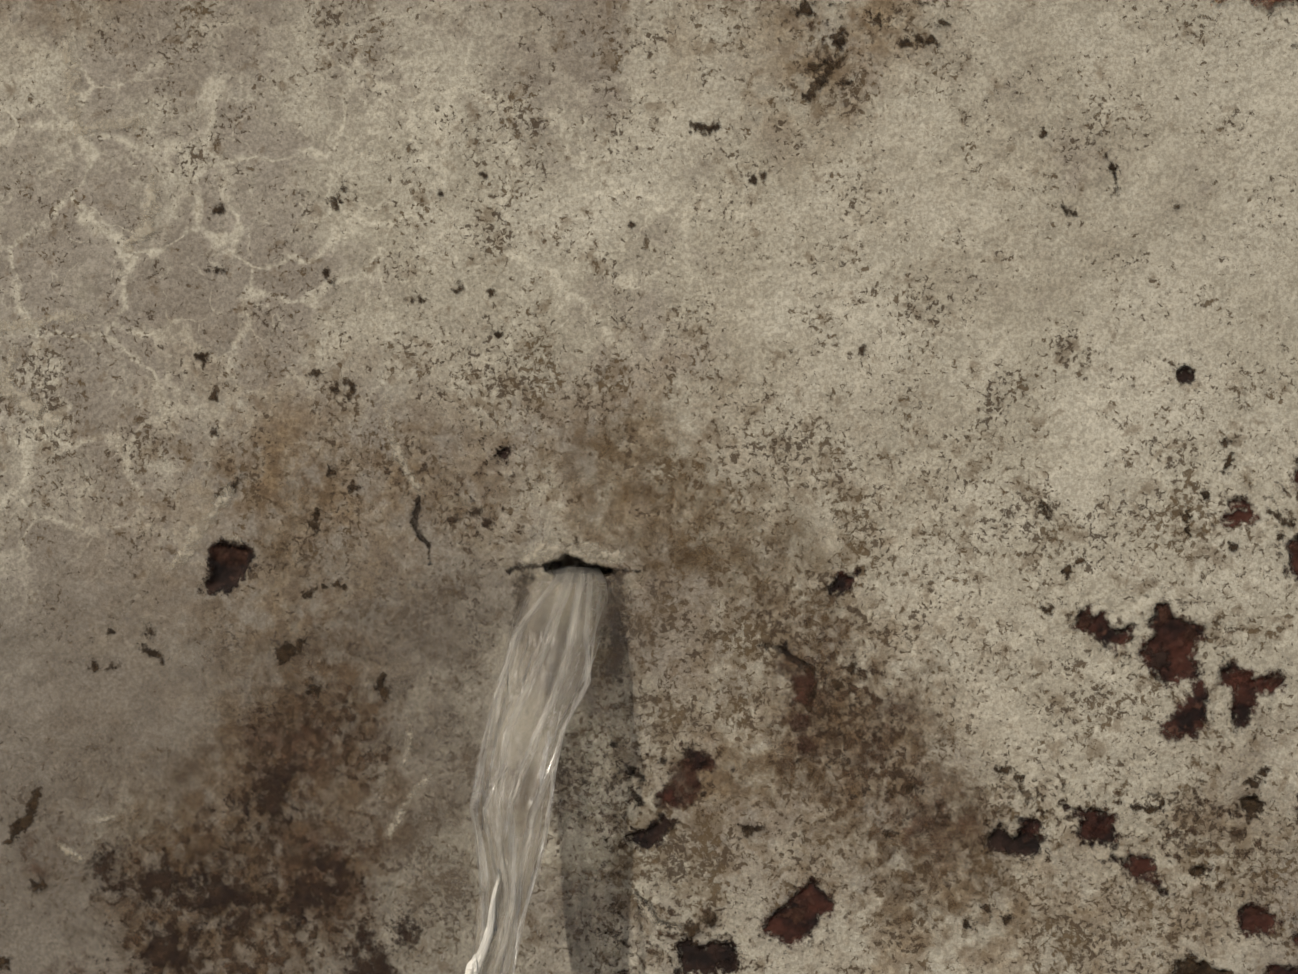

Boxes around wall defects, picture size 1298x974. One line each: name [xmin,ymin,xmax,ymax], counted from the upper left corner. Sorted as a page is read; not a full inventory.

rust [1207,440,1298,532]
crack [506,561,562,572]
crack [607,567,639,576]
rust [1265,535,1298,586]
rust [1067,595,1287,747]
rust [618,741,735,850]
rust [1229,793,1266,819]
rust [1063,788,1168,896]
rust [674,867,849,974]
rust [1236,889,1298,945]
rust [1158,948,1233,974]
rust [1266,963,1298,974]